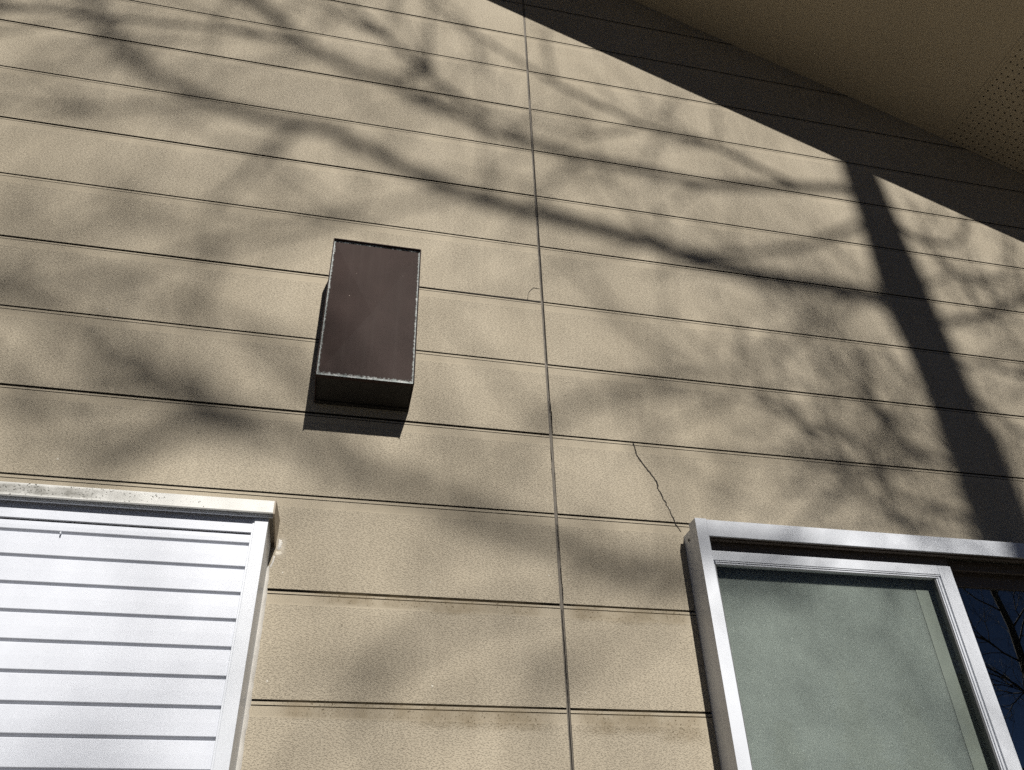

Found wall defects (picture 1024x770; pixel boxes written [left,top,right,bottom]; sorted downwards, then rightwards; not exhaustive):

crack [633,441,681,531]